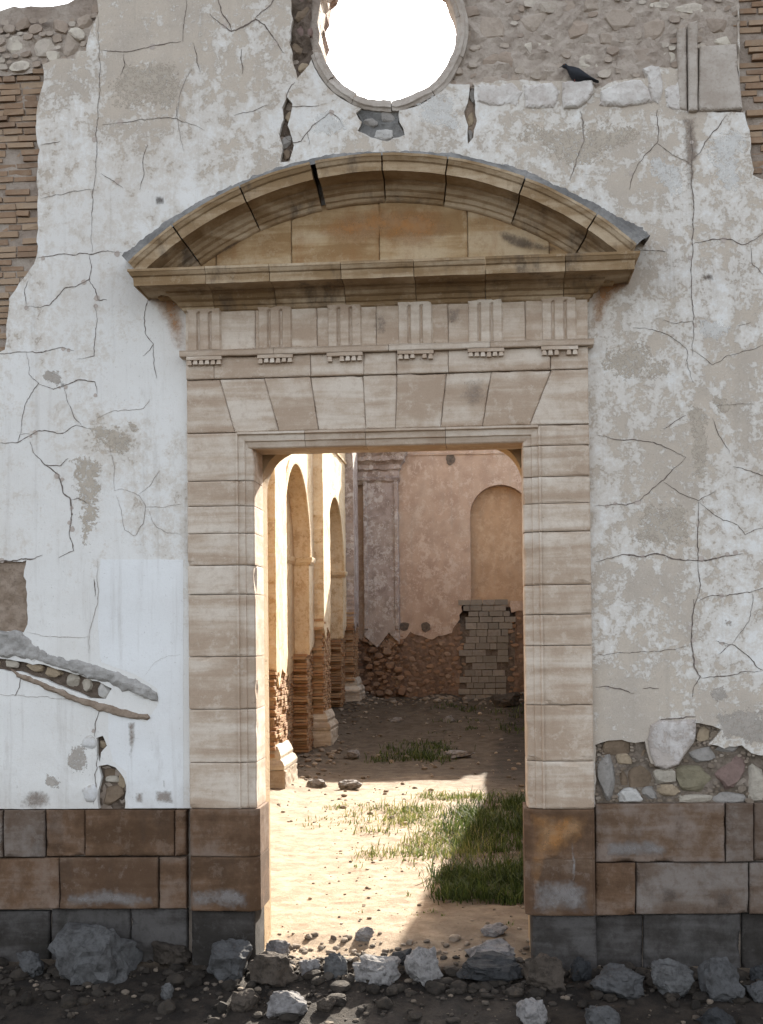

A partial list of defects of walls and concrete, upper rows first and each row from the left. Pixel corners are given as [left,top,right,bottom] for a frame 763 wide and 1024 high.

spalling [290,0,313,77]
crack [44,2,202,216]
spalling [357,108,405,141]
flaking render [0,69,44,351]
crack [629,113,761,381]
crack [143,299,157,378]
crack [0,243,148,563]
crack [110,450,181,536]
spalling [0,561,28,632]
crack [596,415,762,720]
spalling [67,736,126,809]
spalling [594,687,763,808]